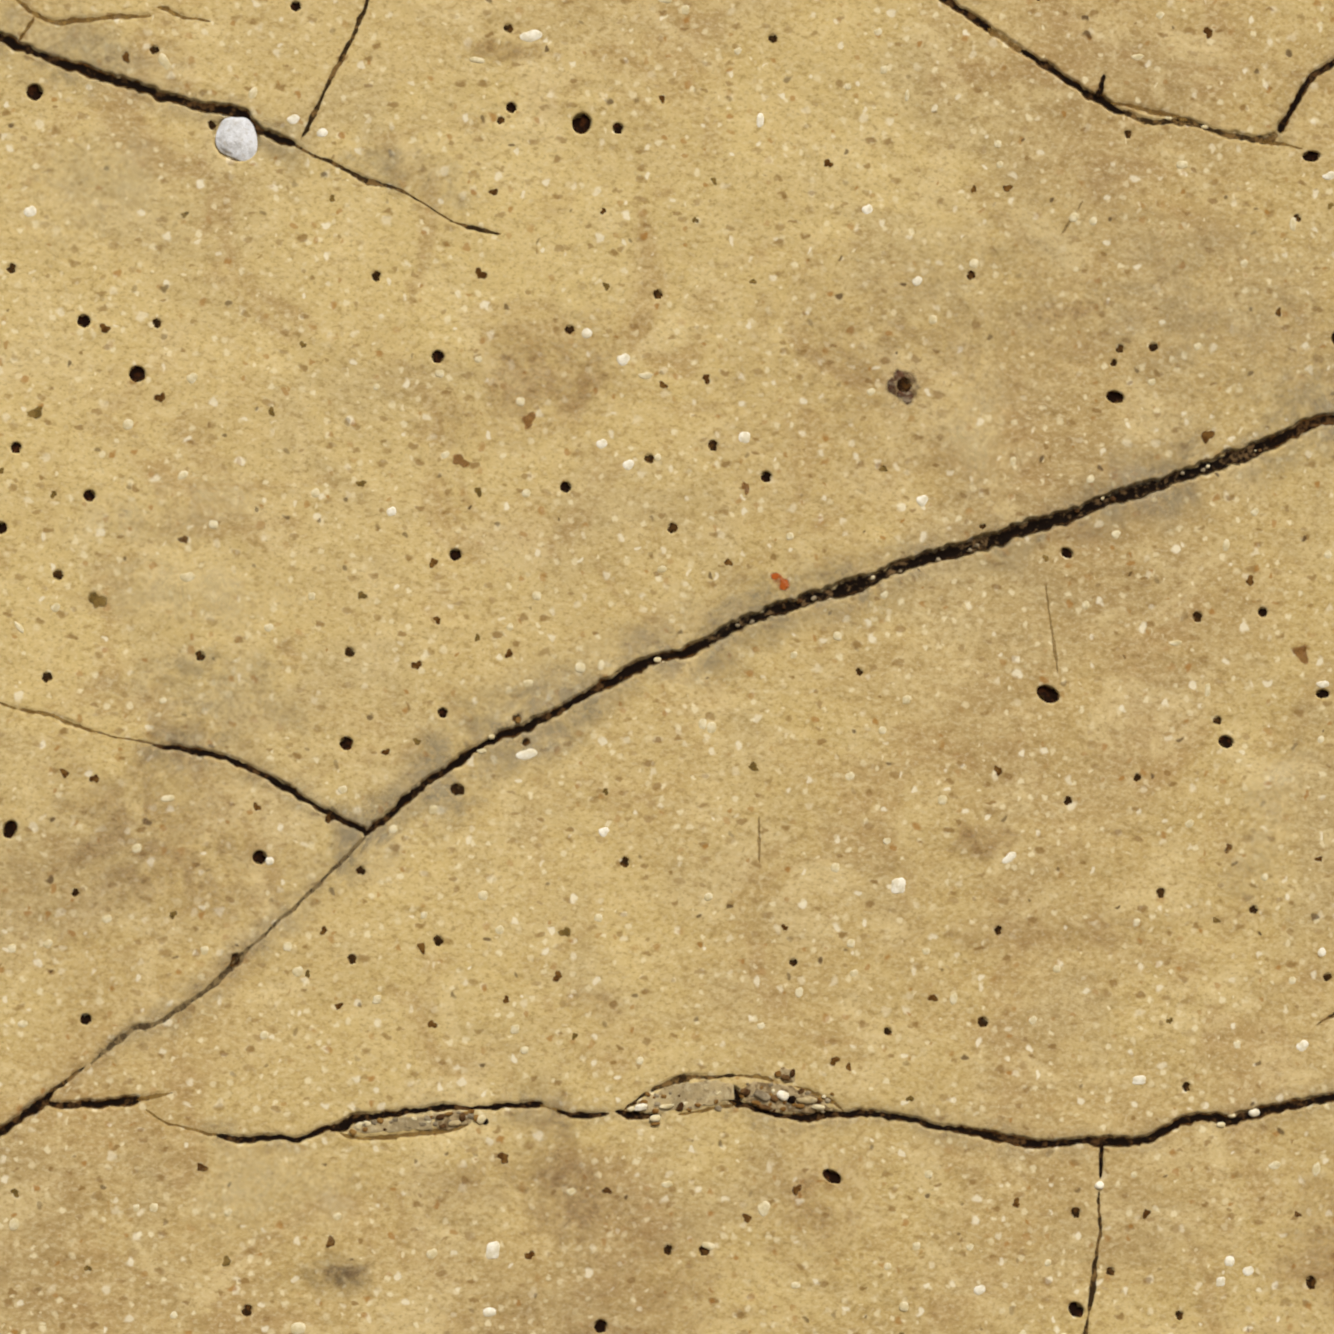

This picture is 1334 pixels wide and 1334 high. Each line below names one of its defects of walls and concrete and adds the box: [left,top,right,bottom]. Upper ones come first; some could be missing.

crack [0,0,501,235]
crack [940,0,1334,149]
crack [0,414,1334,1334]